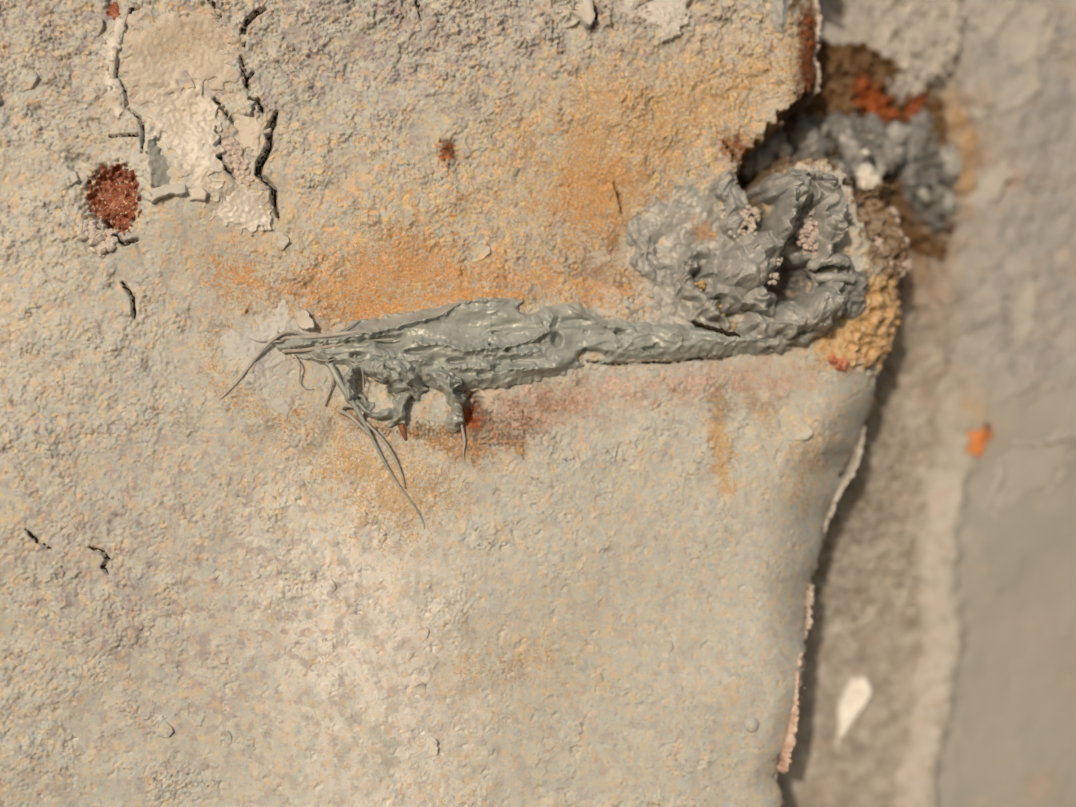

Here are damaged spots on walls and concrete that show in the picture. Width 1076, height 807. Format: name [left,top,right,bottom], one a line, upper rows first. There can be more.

peeling [87,5,290,251]
rust [849,71,927,127]
rust [84,163,142,236]
rust [191,9,901,558]
rust [967,425,993,457]